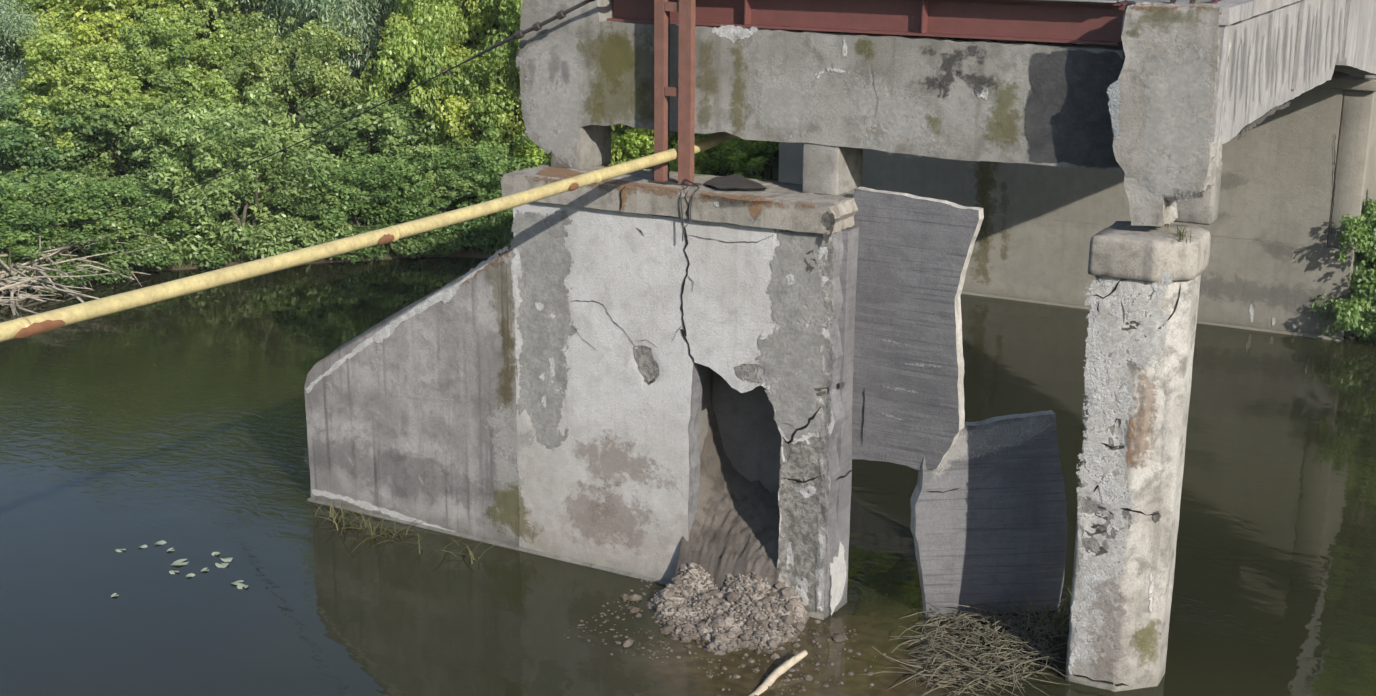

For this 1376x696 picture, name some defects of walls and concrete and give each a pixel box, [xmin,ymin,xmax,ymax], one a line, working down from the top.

rust [14,320,66,338]
peeling [305,210,577,451]
crack [571,191,773,365]
peeling [734,211,846,615]
crack [780,388,865,483]
leakage [979,167,991,243]
peeling [1068,272,1174,674]
rust [1127,375,1158,468]